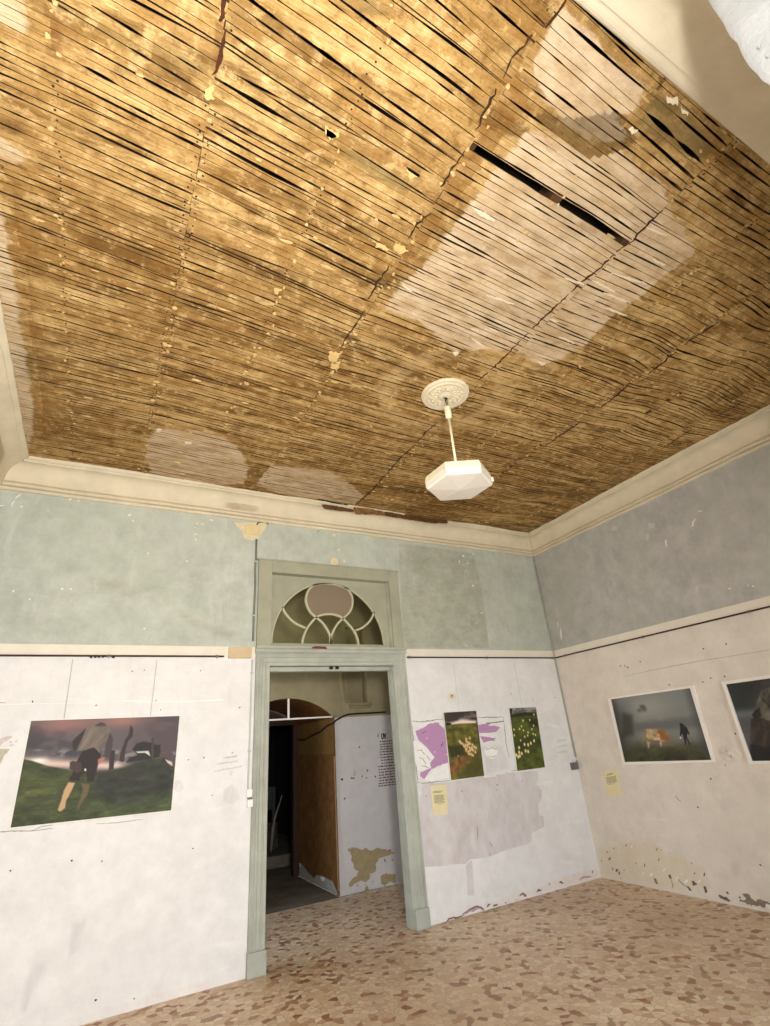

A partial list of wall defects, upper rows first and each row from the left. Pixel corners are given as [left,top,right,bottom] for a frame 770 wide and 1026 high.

crack [212,0,227,75]
leakage [626,45,725,176]
leakage [329,0,556,346]
crack [408,213,431,239]
crack [340,266,389,348]
leakage [565,277,630,316]
flaking render [299,847,396,896]
flaking render [446,881,564,922]
flaking render [654,874,770,909]